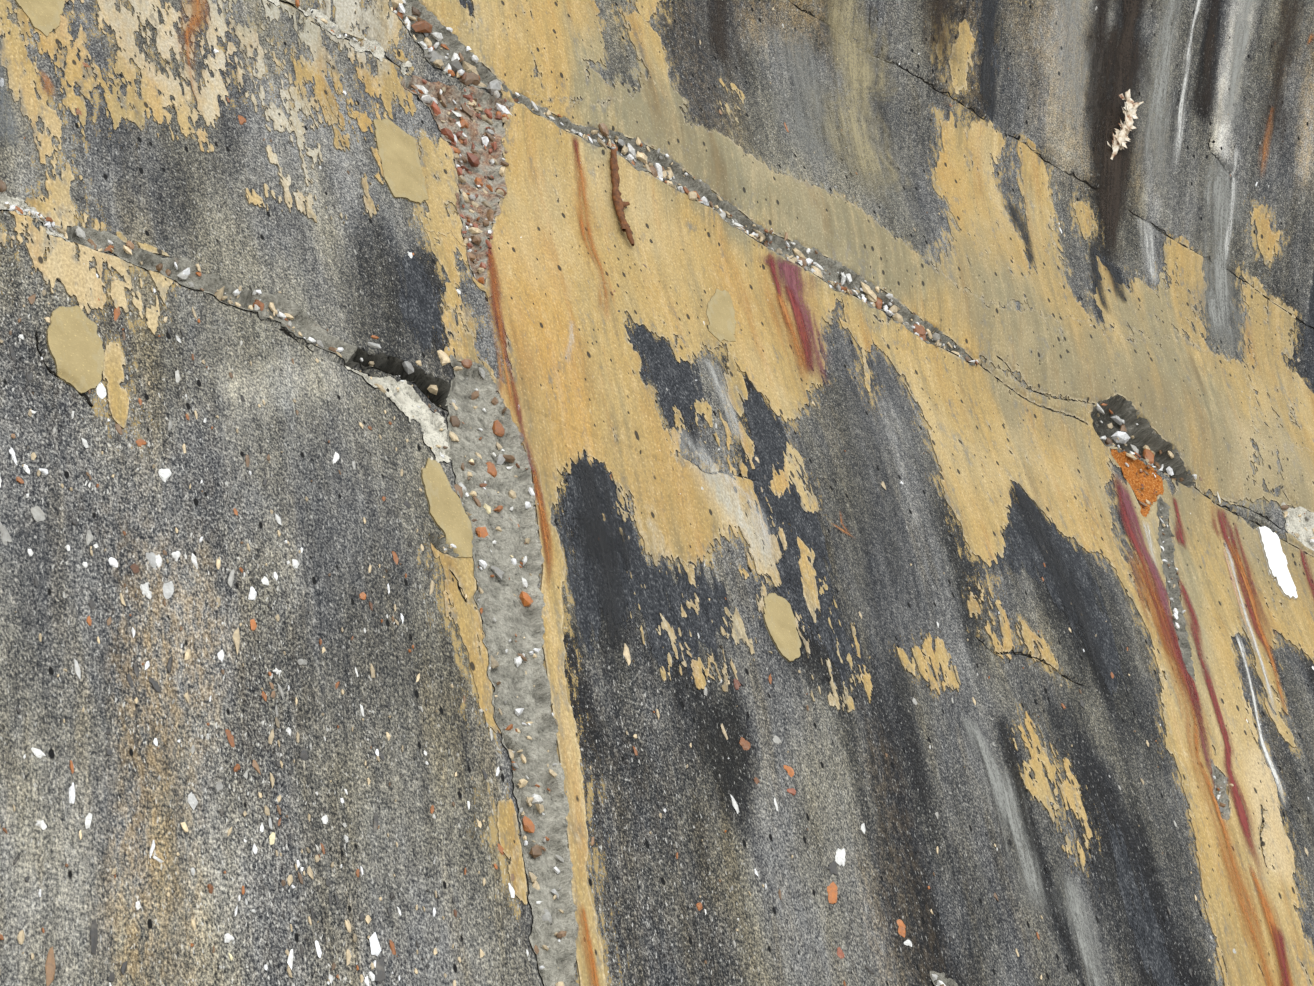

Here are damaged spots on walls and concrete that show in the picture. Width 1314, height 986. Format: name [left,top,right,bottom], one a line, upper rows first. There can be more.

crack [279,0,407,72]
crack [788,0,1099,189]
corrosion [574,140,607,294]
crack [36,331,93,407]
corrosion [766,255,825,373]
peeling [896,622,976,711]
damp [984,481,1133,698]
damp [1226,546,1283,794]
peeling [220,651,308,856]
damp [965,720,1043,899]
peeling [1010,711,1093,873]
peeling [281,843,461,986]